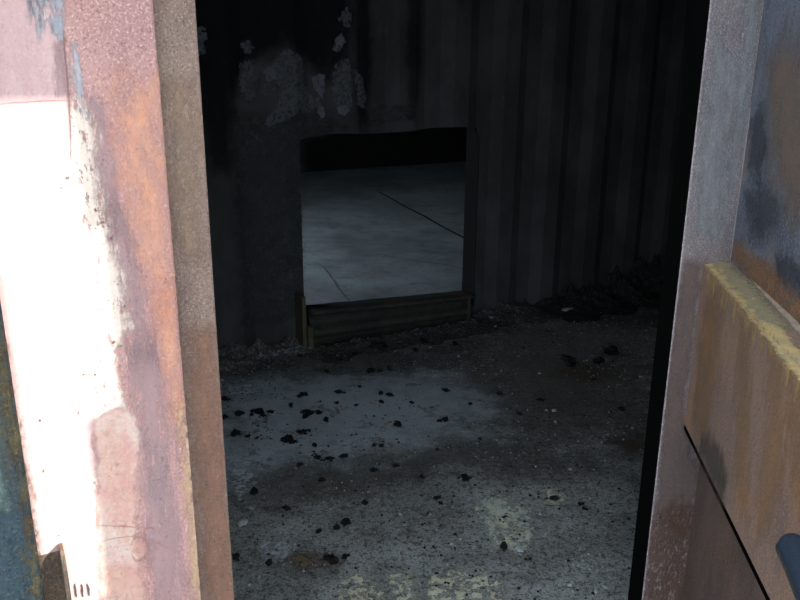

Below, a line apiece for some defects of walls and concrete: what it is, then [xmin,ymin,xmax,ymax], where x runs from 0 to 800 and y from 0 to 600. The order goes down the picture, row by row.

peeling [238,7,367,127]
corrosion [122,78,175,282]
corrosion [733,243,800,324]
corrosion [160,292,233,600]
corrosion [643,504,691,600]